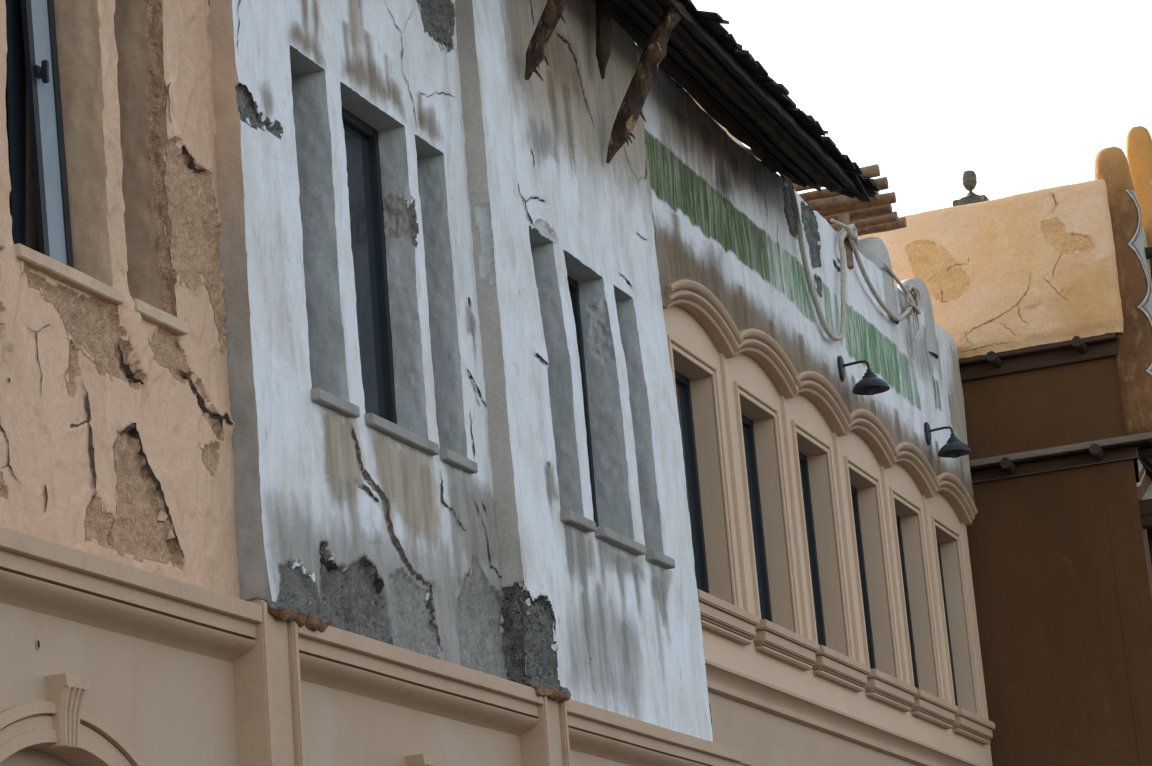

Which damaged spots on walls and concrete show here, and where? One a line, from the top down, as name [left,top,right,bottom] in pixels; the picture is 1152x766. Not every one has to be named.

crack [385,2,454,125]
spalling [417,0,455,54]
spalling [144,0,227,355]
spalling [20,260,224,475]
crack [957,253,1070,353]
crack [0,425,48,513]
spalling [85,421,185,569]
crack [319,542,339,570]
spalling [277,541,439,659]
crack [351,425,443,650]
spalling [457,554,560,686]
water stain [566,524,668,700]